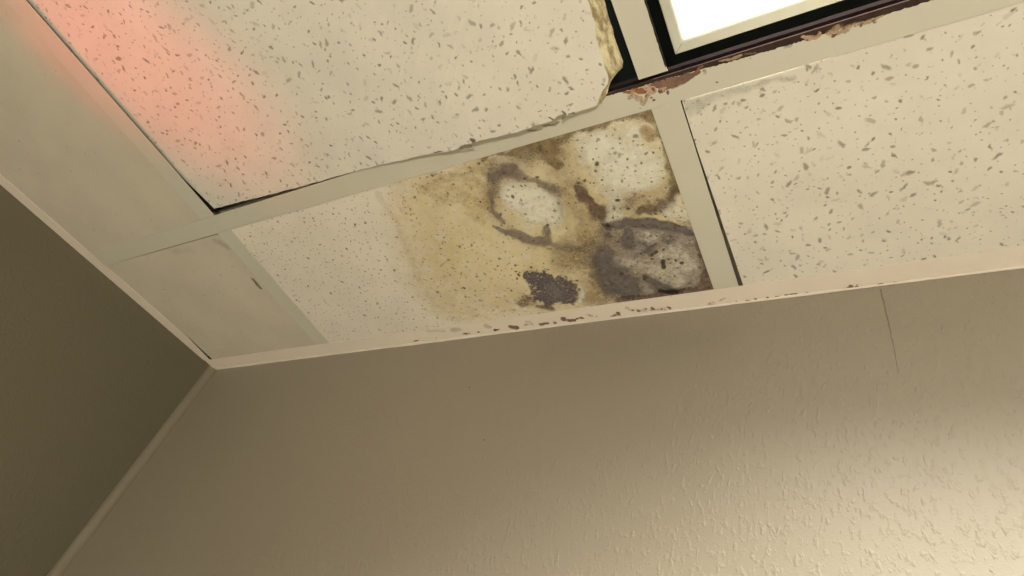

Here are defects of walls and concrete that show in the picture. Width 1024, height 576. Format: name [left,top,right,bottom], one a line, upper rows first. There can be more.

rust [606,0,930,109]
leakage [412,110,713,311]
crack [880,289,899,374]